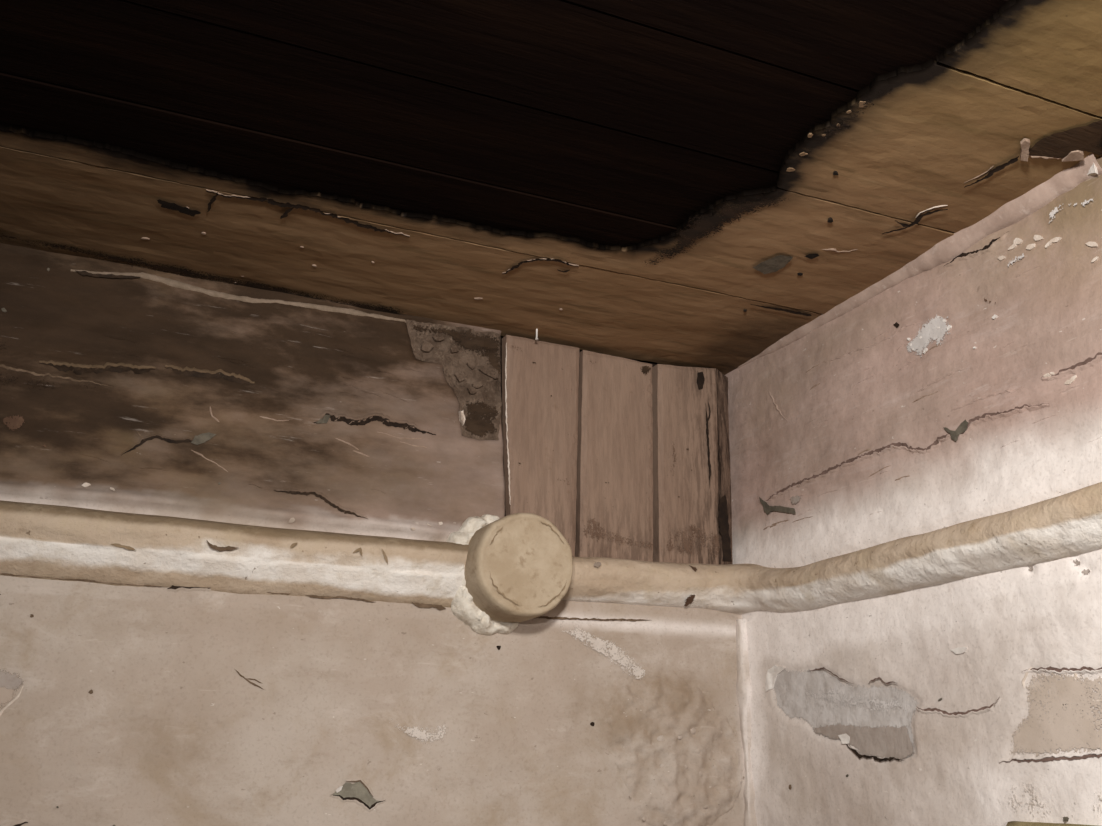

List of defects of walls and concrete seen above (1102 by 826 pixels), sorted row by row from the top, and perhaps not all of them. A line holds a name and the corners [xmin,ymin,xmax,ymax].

crack [882,156,1019,234]
crack [502,258,579,274]
peeling [998,235,1061,267]
crack [0,360,255,387]
spalling [71,269,502,440]
crack [120,407,228,472]
crack [260,410,436,457]
crack [765,352,1102,503]
spalling [765,665,919,762]
peeling [1010,667,1102,757]
spalling [329,778,386,812]